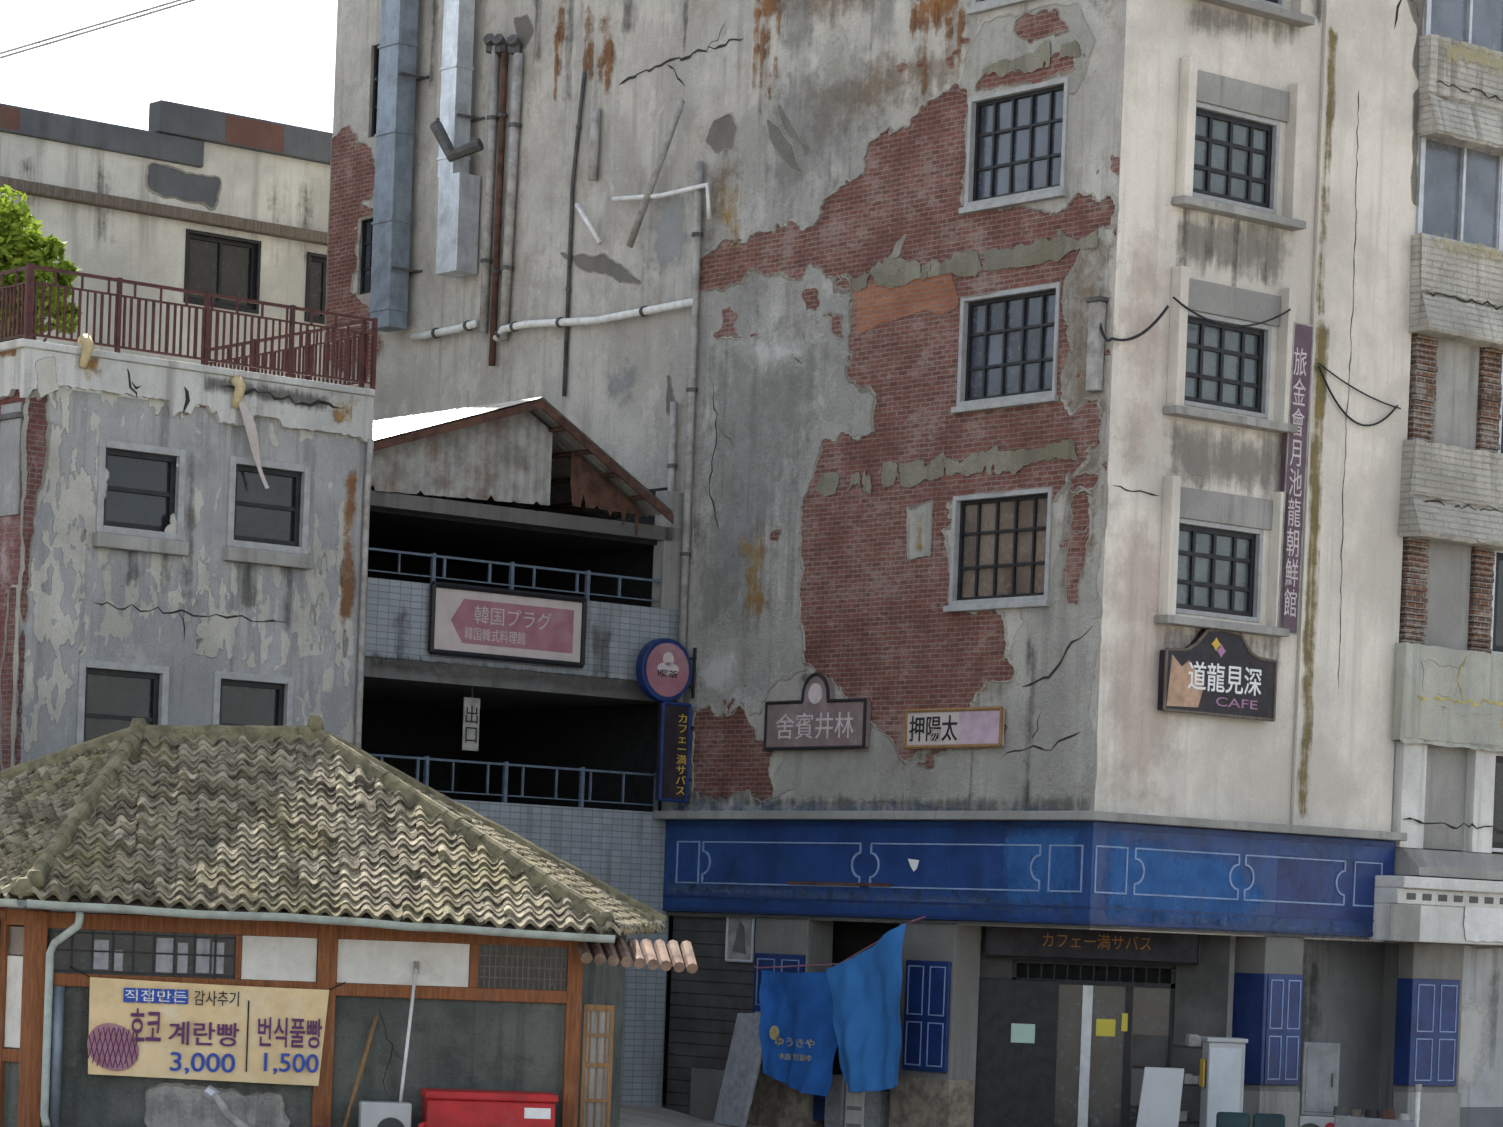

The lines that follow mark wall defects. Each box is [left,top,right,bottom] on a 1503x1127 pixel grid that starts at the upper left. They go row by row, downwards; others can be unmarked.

rust [554,8,564,100]
rust [583,8,614,92]
crack [619,23,744,86]
rust [807,0,965,134]
flaking render [324,125,384,378]
crack [1427,291,1503,310]
crack [183,385,341,413]
flaking render [684,2,1119,811]
peeling [0,356,355,770]
crack [94,602,282,639]
rust [340,472,357,618]
crack [1004,626,1093,756]